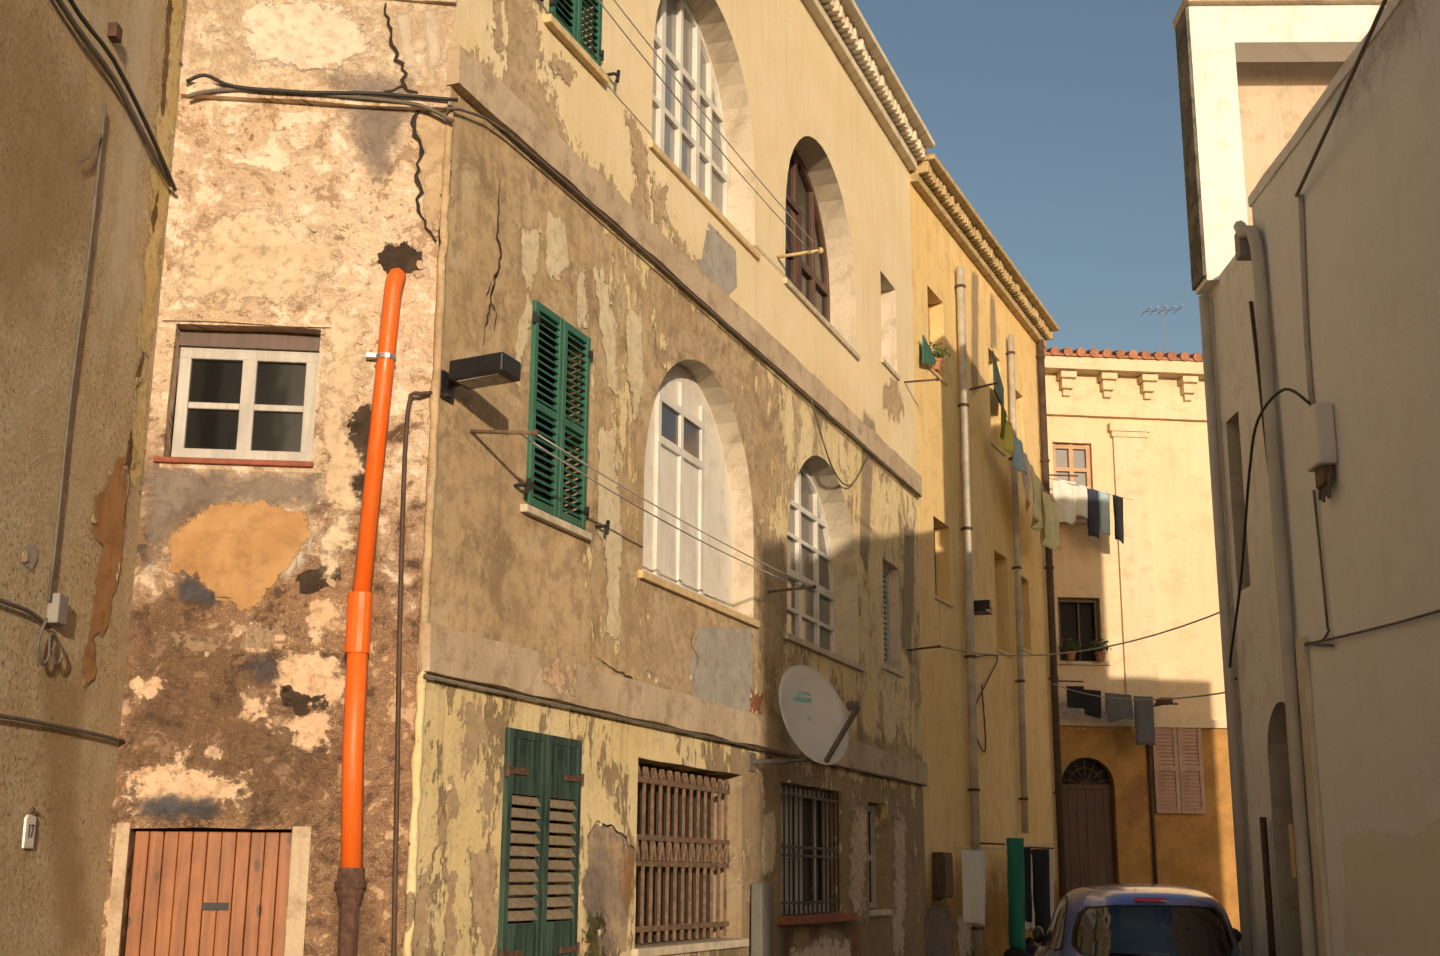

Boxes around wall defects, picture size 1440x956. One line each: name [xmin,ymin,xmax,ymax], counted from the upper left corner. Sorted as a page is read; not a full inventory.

crack [384,3,452,272]
flaking render [408,111,455,237]
peeling [469,0,703,282]
spalling [377,241,424,278]
crack [483,186,502,345]
flaking render [82,0,373,759]
leakage [144,464,321,554]
leakage [283,530,315,575]
flaking render [118,742,253,816]
peeling [412,692,498,956]
flaking render [579,820,635,953]
flaking render [788,796,868,956]